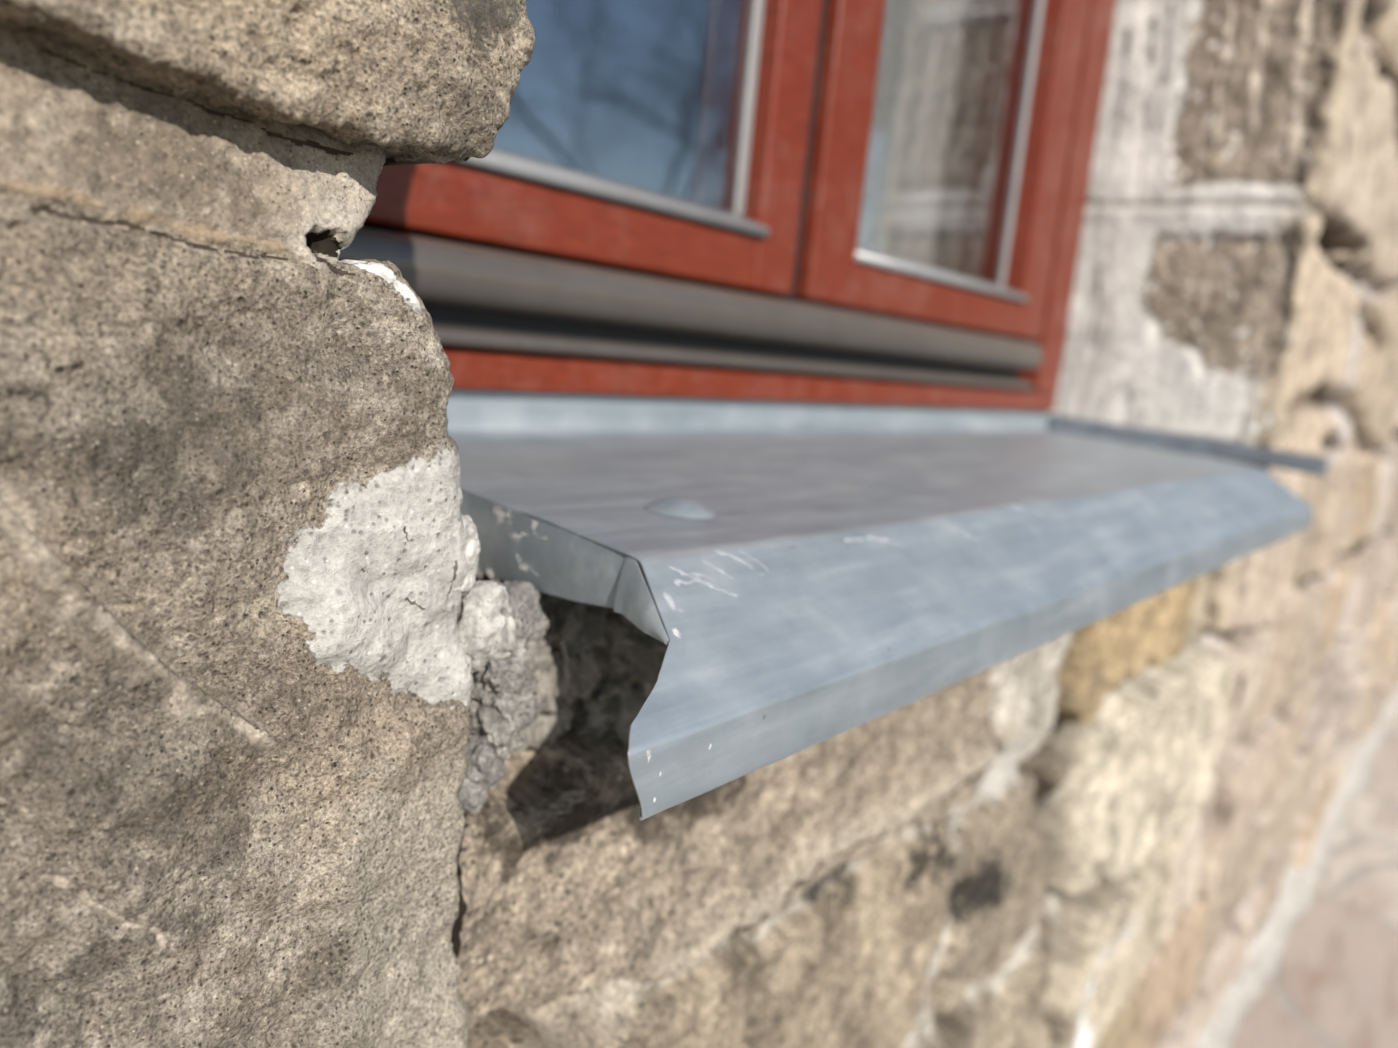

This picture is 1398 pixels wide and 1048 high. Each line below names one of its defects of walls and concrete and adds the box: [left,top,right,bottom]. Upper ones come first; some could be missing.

crack [15,41,353,156]
crack [8,203,356,275]
spalling [457,559,680,815]